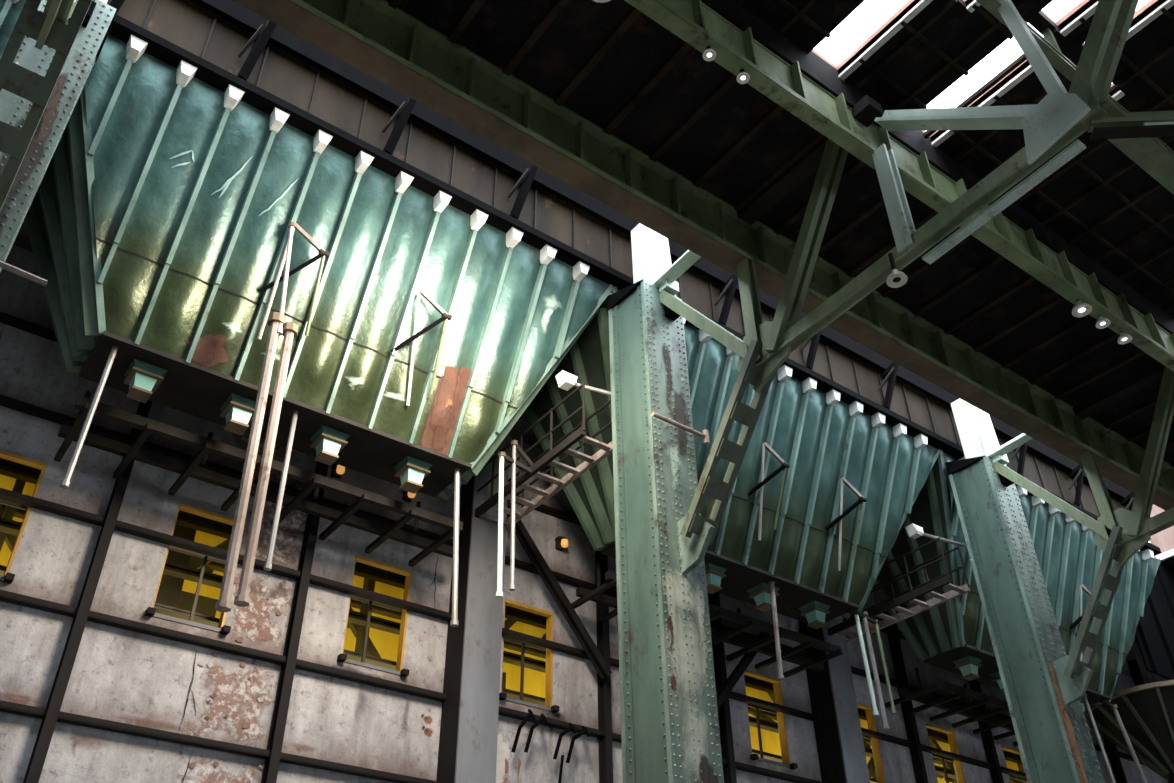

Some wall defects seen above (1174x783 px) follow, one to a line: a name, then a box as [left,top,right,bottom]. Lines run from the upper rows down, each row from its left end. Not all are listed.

corrosion [29,74,68,146]
corrosion [188,334,228,368]
corrosion [421,366,471,455]
flaking render [187,651,272,748]
corrosion [1048,661,1088,783]
flaking render [185,758,264,783]